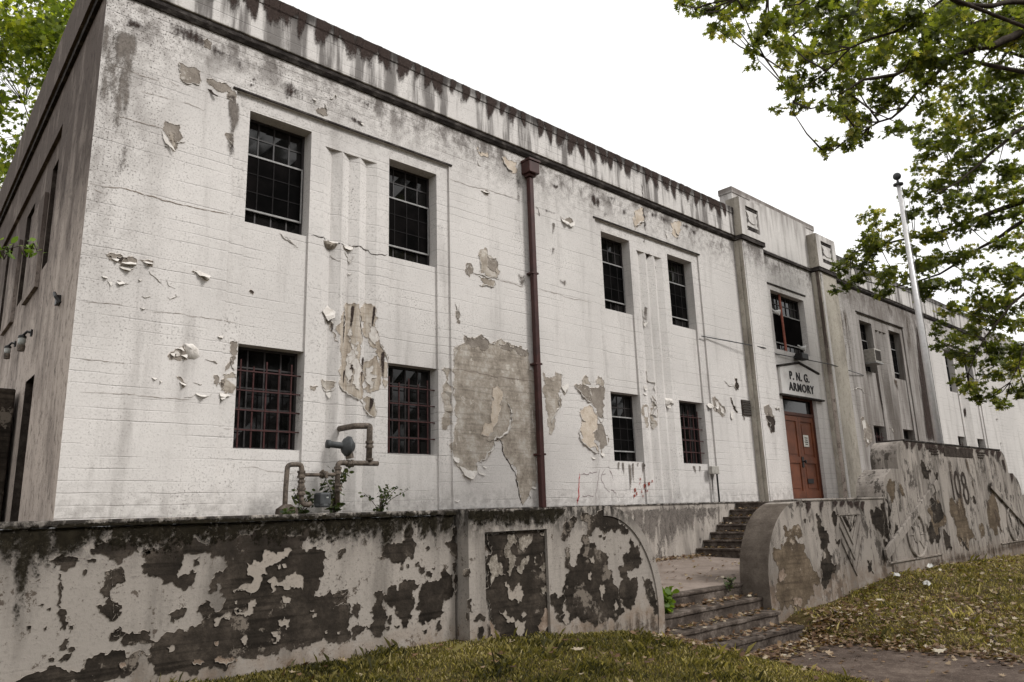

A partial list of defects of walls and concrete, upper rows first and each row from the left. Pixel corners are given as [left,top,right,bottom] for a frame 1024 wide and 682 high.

leakage [101,19,143,126]
leakage [171,23,223,54]
peeling [178,63,237,100]
leakage [228,0,726,217]
peeling [102,252,177,300]
peeling [465,247,500,287]
peeling [167,336,239,400]
peeling [310,302,389,418]
peeling [441,304,609,505]
peeling [14,510,658,682]
peeling [772,501,857,611]
peeling [870,479,906,547]